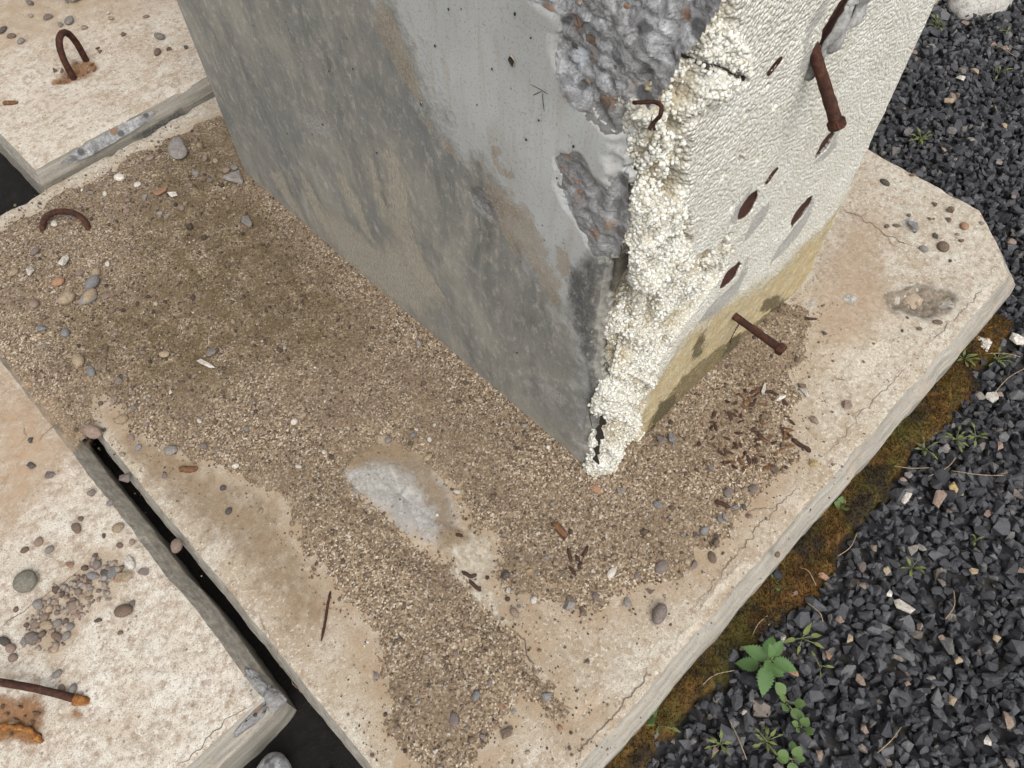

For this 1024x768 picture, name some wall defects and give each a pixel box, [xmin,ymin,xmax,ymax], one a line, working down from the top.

spalling [530,0,721,135]
crack [681,53,746,82]
spalling [555,145,630,260]
crack [843,208,912,247]
leakage [569,261,606,402]
leakage [636,211,838,441]
crack [589,407,607,464]
corrosion [0,696,44,744]